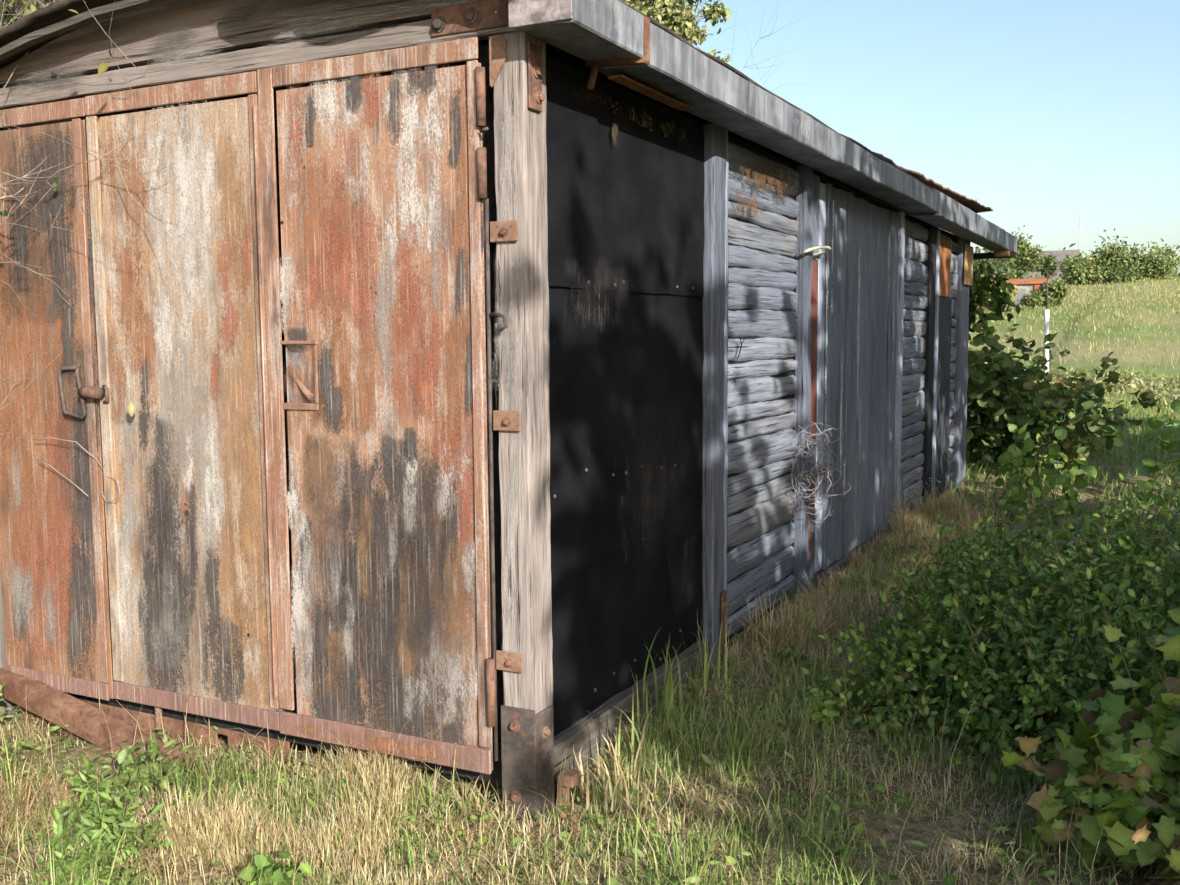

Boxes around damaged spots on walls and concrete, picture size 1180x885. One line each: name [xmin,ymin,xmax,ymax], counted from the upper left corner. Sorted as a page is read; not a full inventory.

peeling [287,77,370,206]
peeling [366,70,449,392]
rust [0,171,80,662]
peeling [147,104,225,553]
rust [288,87,474,647]
peeling [150,539,186,668]
peeling [386,458,418,578]
rust [396,557,420,676]
peeling [405,636,478,725]
peeling [435,444,469,519]
peeling [461,544,476,595]
rust [337,733,437,761]